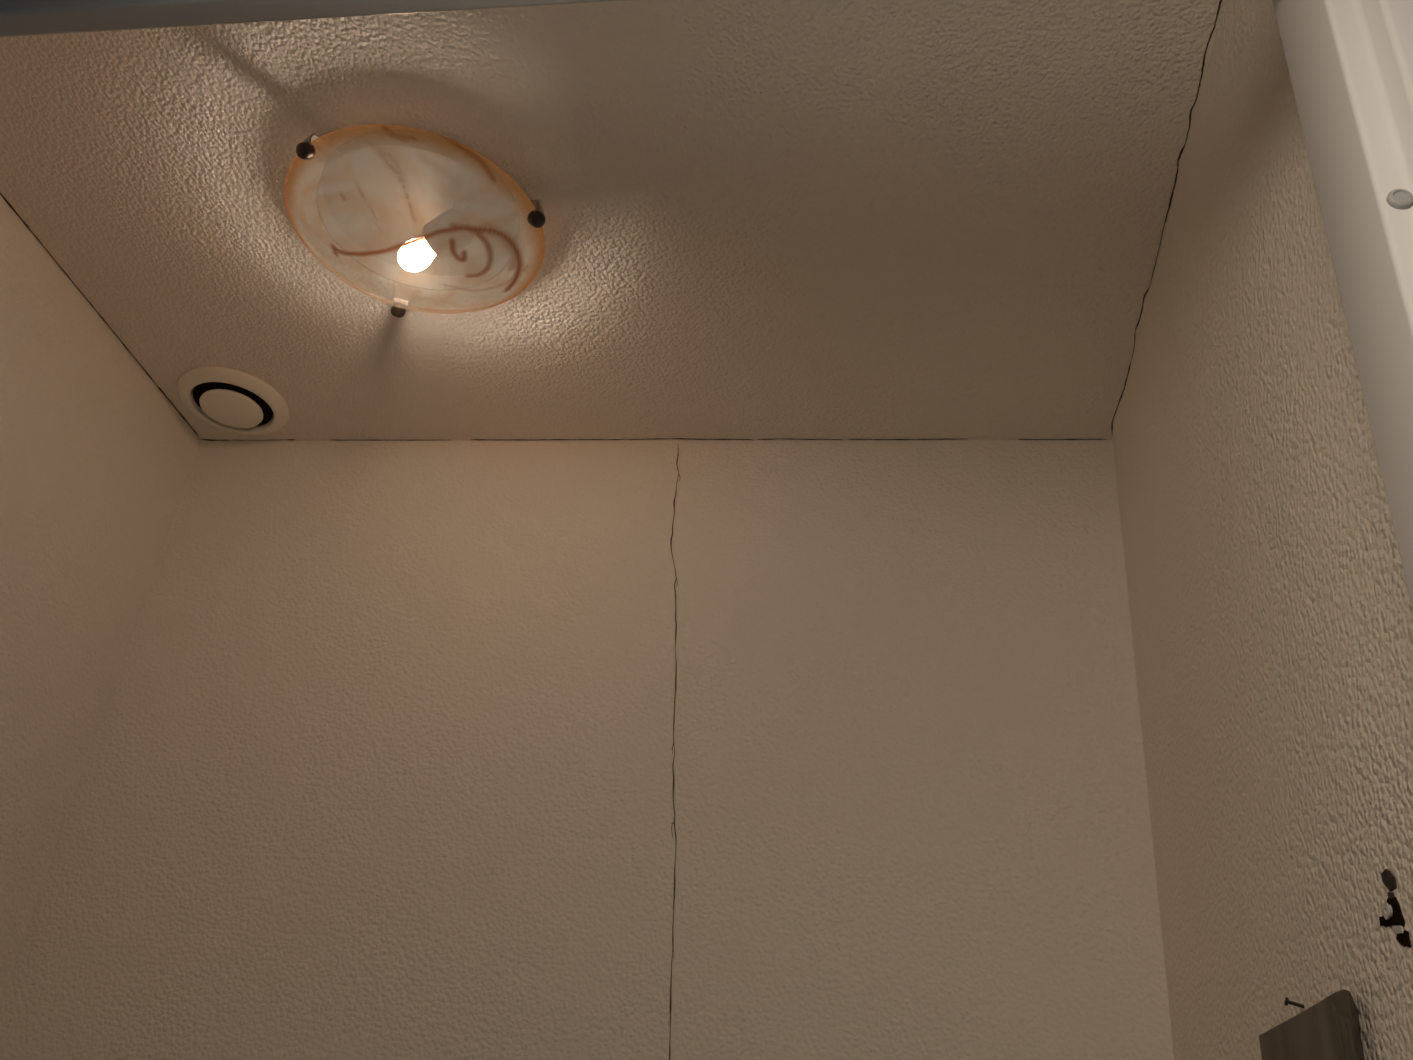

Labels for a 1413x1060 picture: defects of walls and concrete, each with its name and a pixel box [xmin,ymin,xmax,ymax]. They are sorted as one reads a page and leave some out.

crack [1018,0,1223,440]
crack [473,438,958,1060]